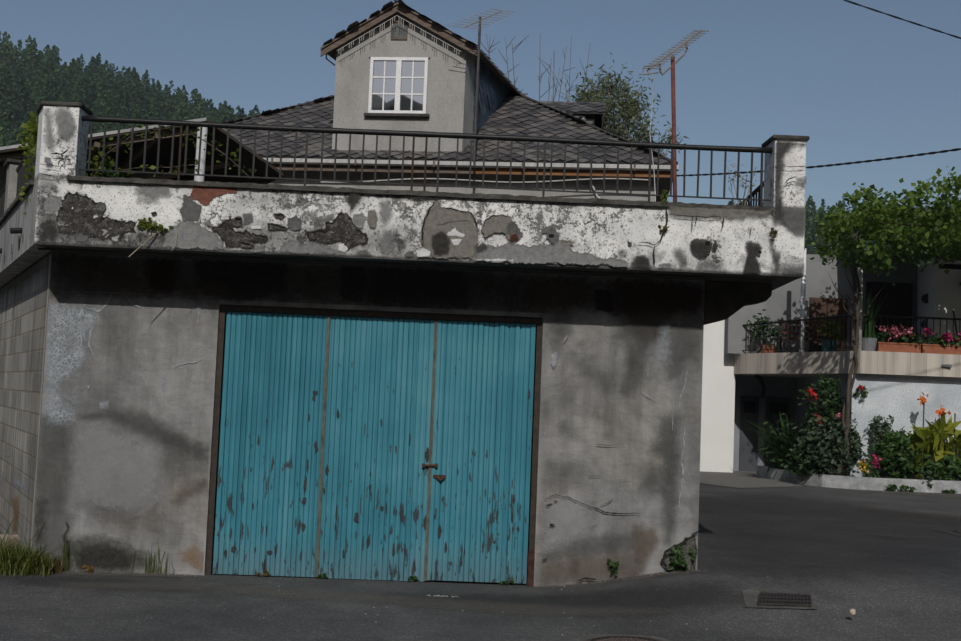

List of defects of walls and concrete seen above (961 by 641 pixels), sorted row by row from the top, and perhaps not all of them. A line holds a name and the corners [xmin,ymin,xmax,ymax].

peeling [44,107,75,163]
spalling [39,179,137,242]
leakage [39,197,165,247]
peeling [136,185,170,198]
spalling [179,186,390,252]
spalling [416,201,629,267]
leakage [169,231,702,312]
crack [546,494,639,514]
leakage [57,522,194,577]
spalling [661,531,698,573]